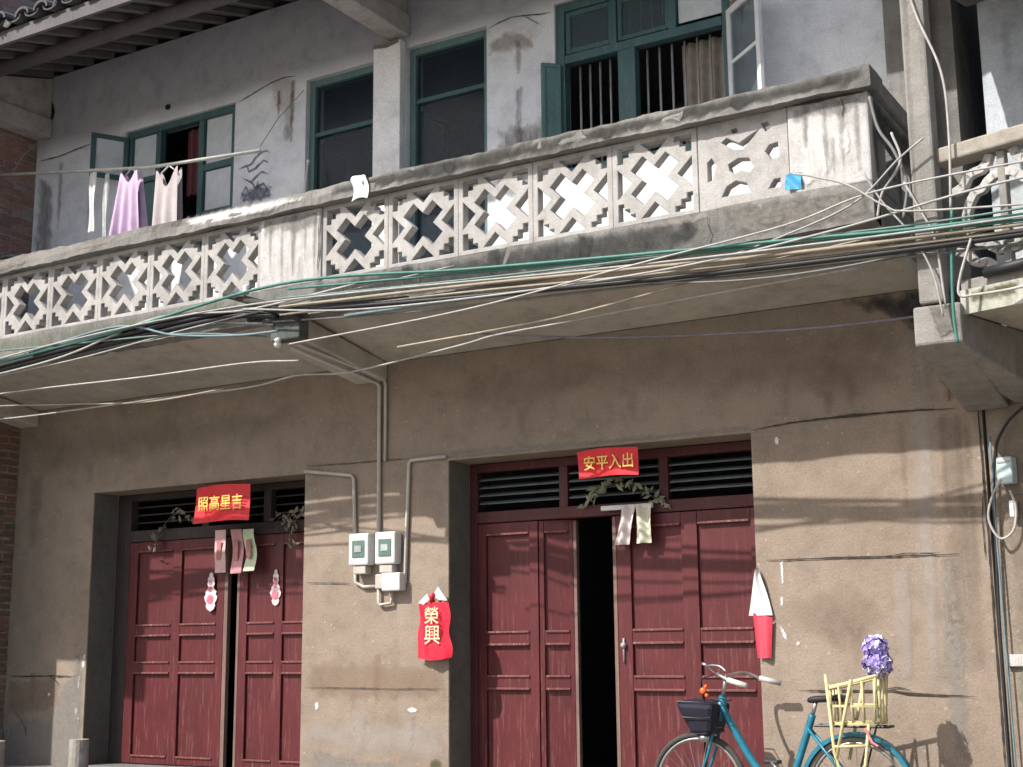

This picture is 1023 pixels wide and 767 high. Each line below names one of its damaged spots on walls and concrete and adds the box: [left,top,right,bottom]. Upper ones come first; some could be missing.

crack [487,12,550,30]
leakage [336,72,856,192]
crack [755,408,1005,764]